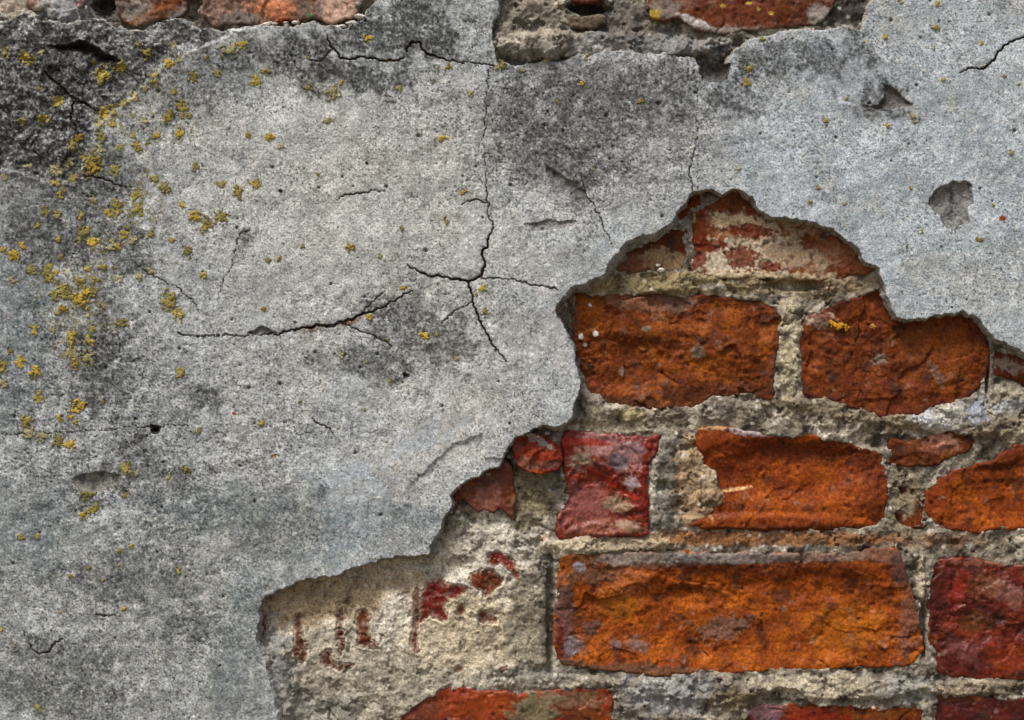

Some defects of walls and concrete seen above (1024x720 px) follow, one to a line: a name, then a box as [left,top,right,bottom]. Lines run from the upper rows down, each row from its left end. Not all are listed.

flaking render [492,0,571,66]
flaking render [724,28,806,80]
flaking render [858,0,874,30]
crack [960,36,1024,73]
crack [44,71,94,141]
crack [178,36,557,362]
peeling [247,326,277,335]
flaking render [256,181,1024,720]